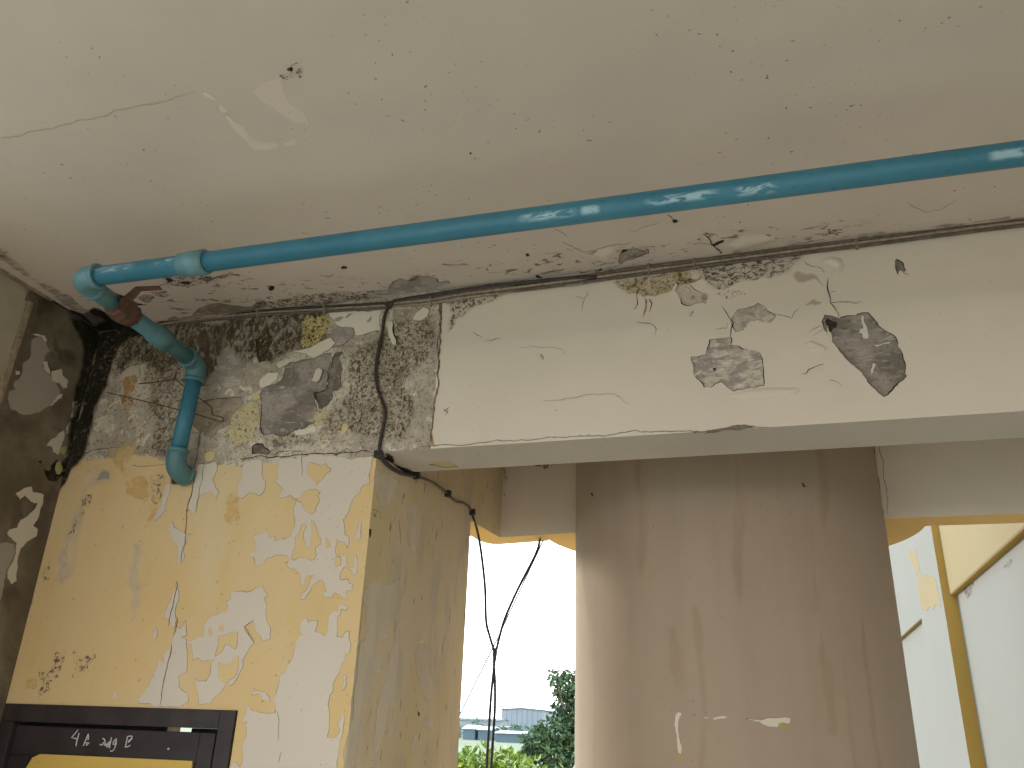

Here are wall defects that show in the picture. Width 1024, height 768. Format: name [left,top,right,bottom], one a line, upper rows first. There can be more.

crack [3,92,196,138]
peeling [8,333,80,459]
peeling [328,309,396,345]
spalling [675,279,708,306]
spalling [691,303,775,391]
spalling [822,312,907,397]
peeling [188,462,219,513]
peeling [0,487,44,600]
peeling [193,331,397,768]
crack [160,587,178,703]
peeling [138,582,271,707]
peeling [747,717,791,727]